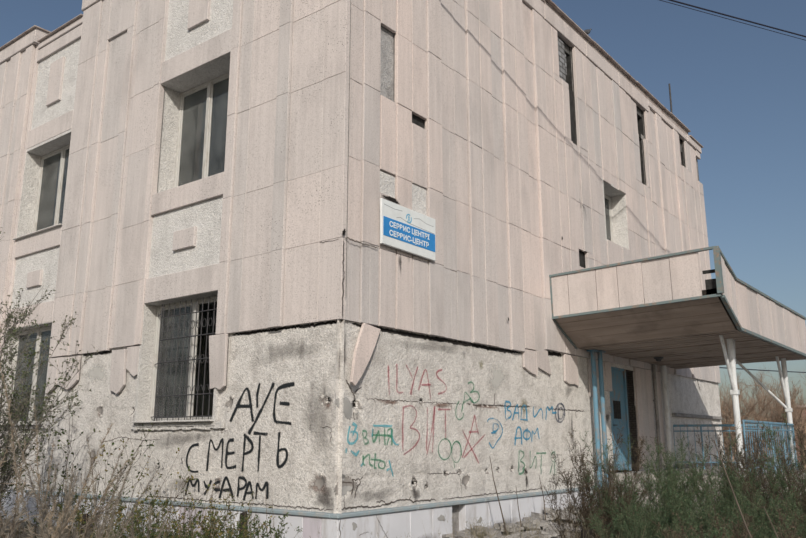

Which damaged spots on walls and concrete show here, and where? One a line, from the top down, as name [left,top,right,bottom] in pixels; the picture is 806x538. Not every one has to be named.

peeling [380,171,395,198]
crack [320,237,377,317]
crack [346,380,530,420]
spalling [311,471,326,491]
spalling [334,474,358,496]